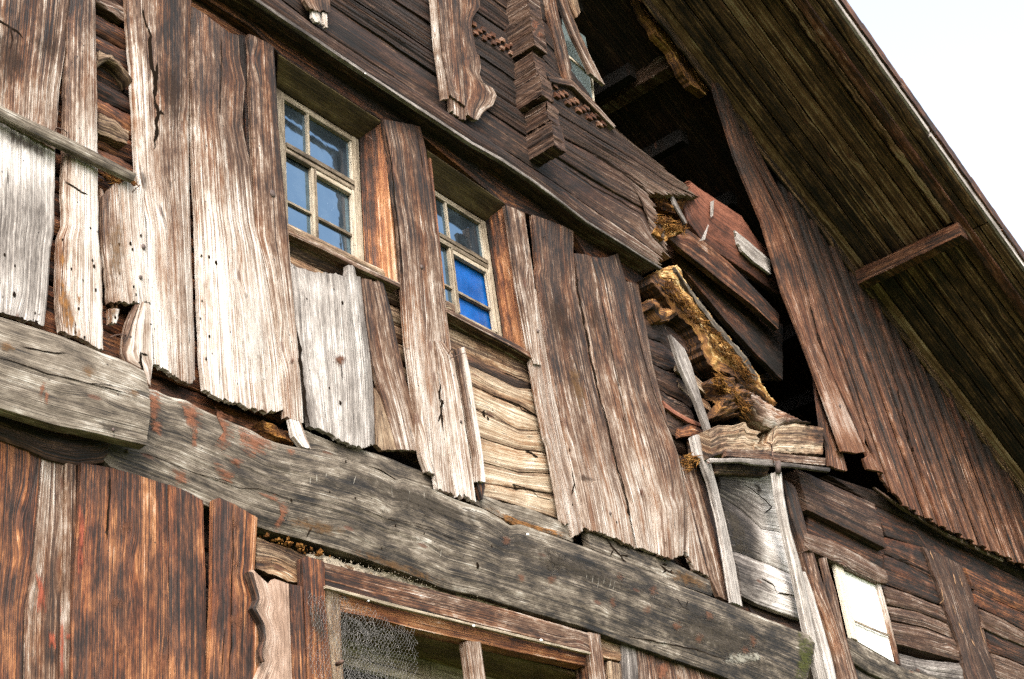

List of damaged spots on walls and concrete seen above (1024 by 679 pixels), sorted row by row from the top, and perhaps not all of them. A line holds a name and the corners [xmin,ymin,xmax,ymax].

crack [142,8,164,149]
corrosion [149,392,161,433]
corrosion [217,413,268,454]
crack [437,384,445,428]